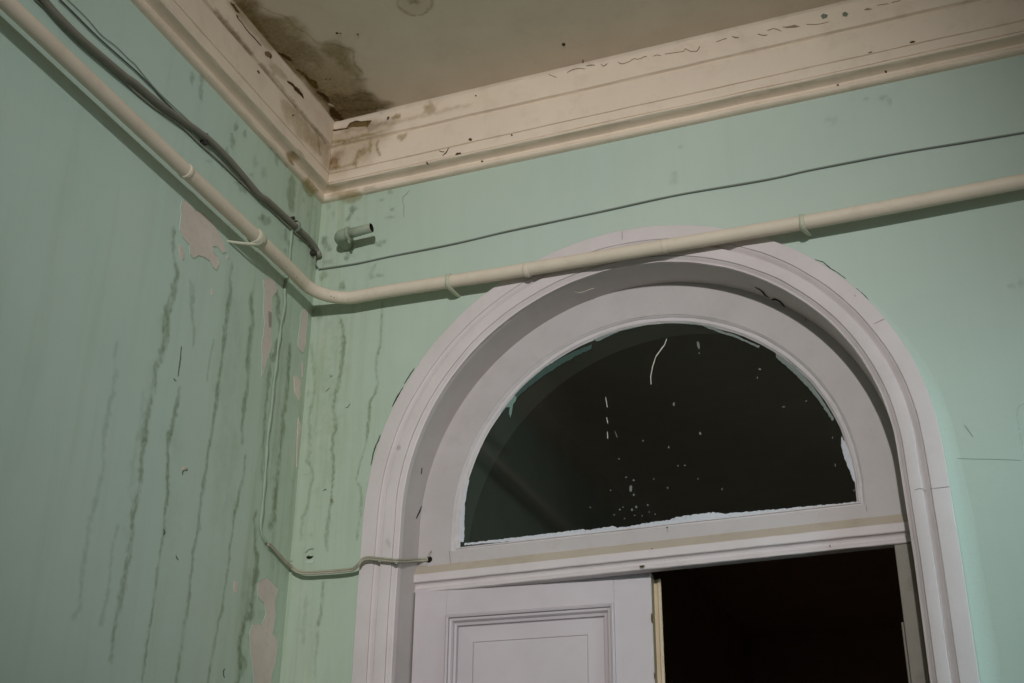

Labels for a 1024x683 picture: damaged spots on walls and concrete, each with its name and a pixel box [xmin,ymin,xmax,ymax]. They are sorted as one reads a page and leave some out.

peeling [178,200,229,271]
peeling [261,277,278,377]
peeling [249,577,279,683]